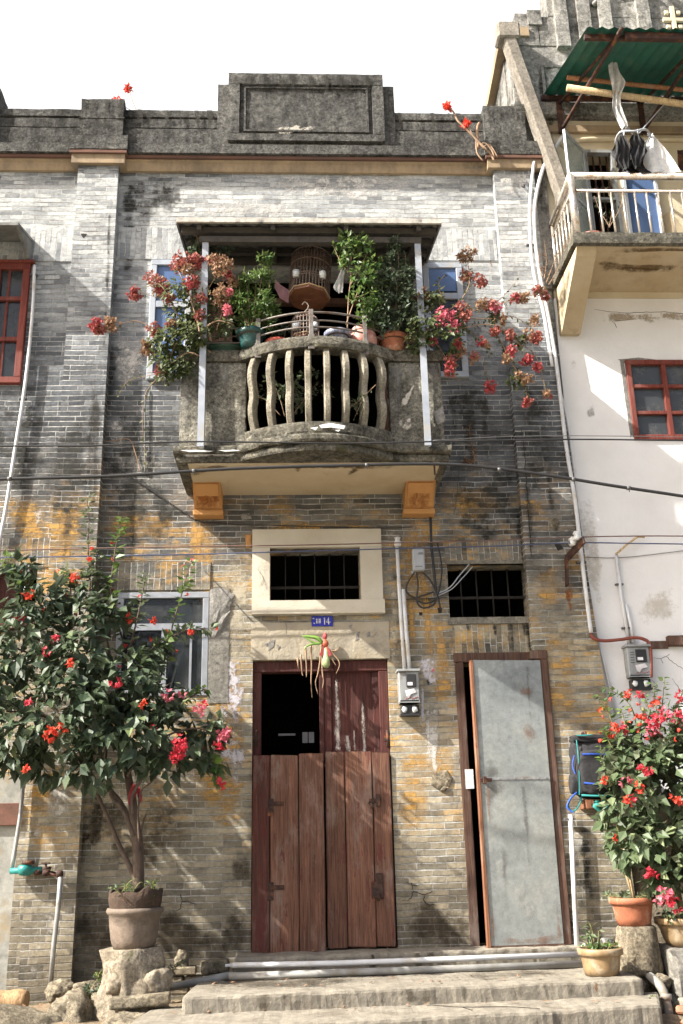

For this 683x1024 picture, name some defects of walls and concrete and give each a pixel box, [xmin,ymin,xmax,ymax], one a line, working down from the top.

damp [123,181,286,227]
damp [267,176,400,199]
flaking render [610,313,683,321]
damp [446,391,489,464]
damp [455,391,554,556]